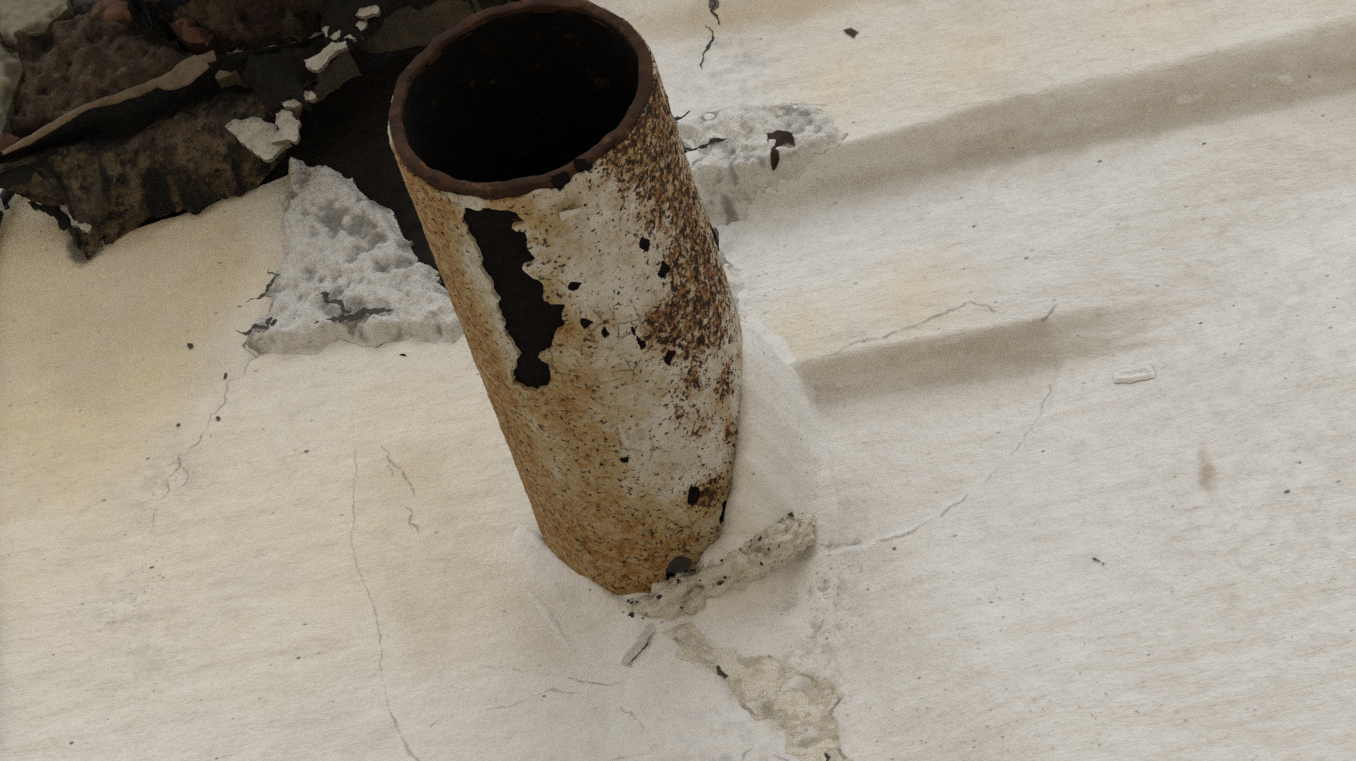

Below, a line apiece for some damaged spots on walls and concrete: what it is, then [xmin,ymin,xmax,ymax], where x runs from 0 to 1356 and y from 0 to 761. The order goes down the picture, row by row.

peeling [236,25,857,761]